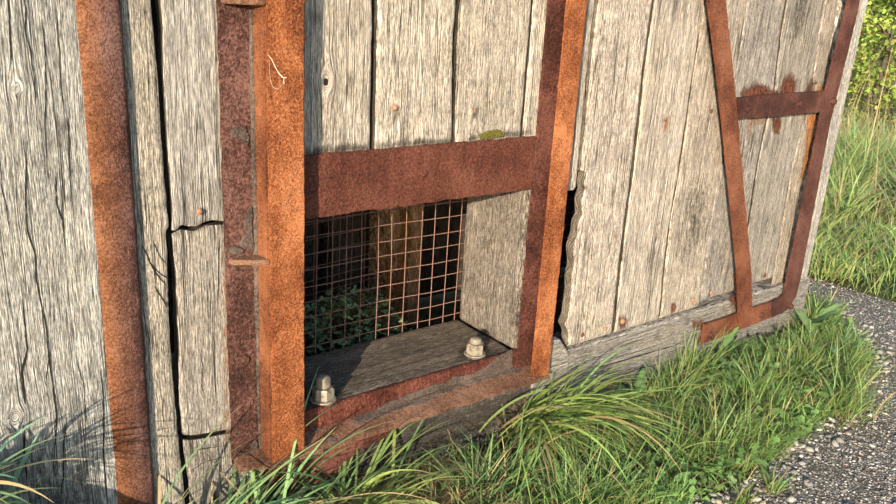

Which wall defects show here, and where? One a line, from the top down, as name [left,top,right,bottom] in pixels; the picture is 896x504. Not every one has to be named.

corrosion [740,75,824,96]
corrosion [801,114,816,178]
crack [0,0,108,504]
crack [139,242,169,359]
crack [213,252,221,311]
corrosion [350,349,524,426]